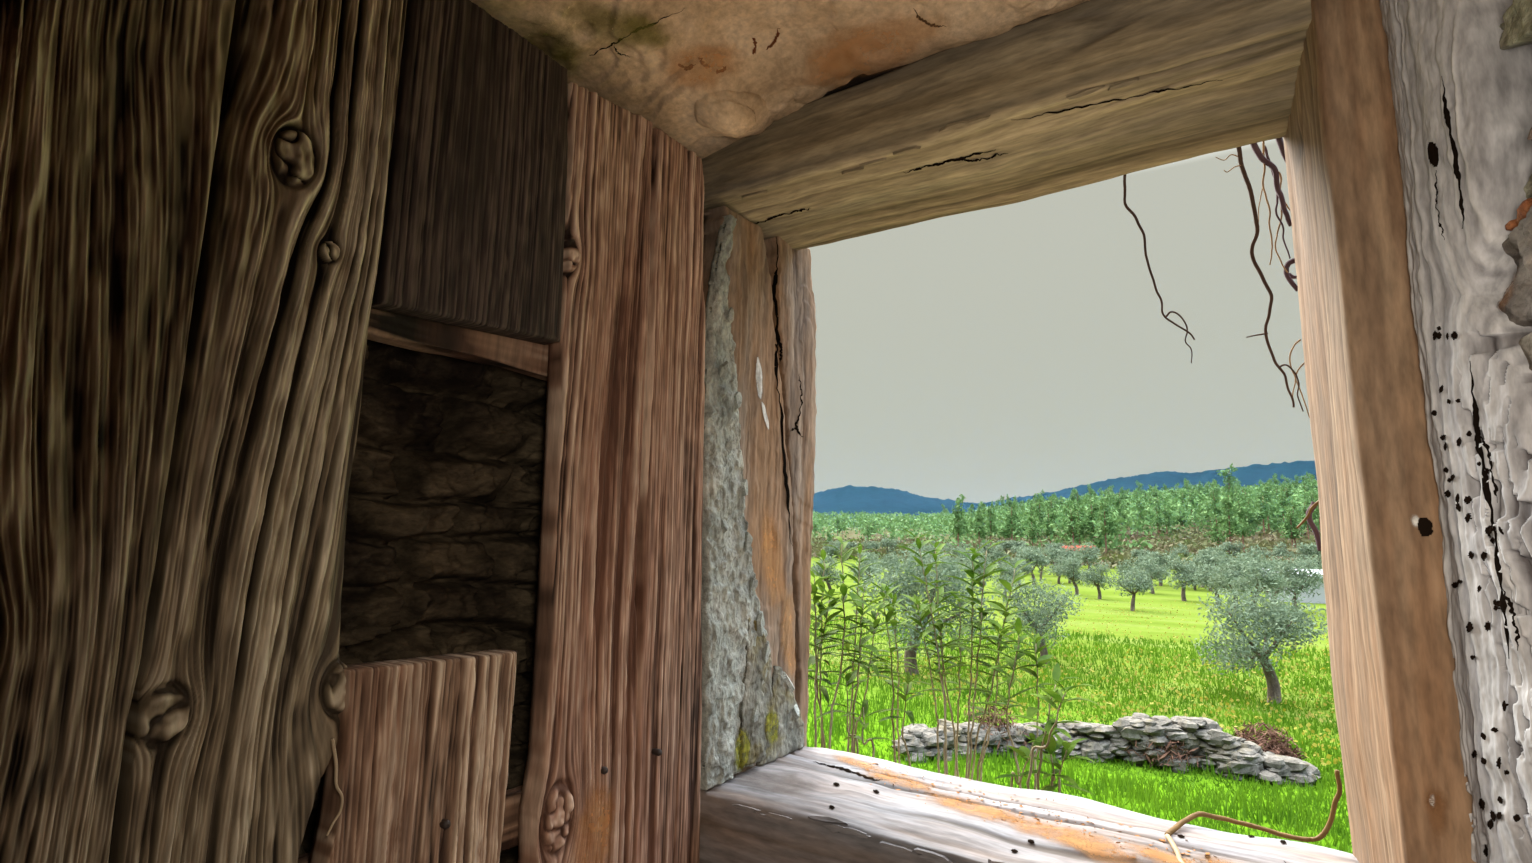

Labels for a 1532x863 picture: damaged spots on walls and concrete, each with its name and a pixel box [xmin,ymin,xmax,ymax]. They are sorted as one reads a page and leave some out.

crack [756,208,809,546]